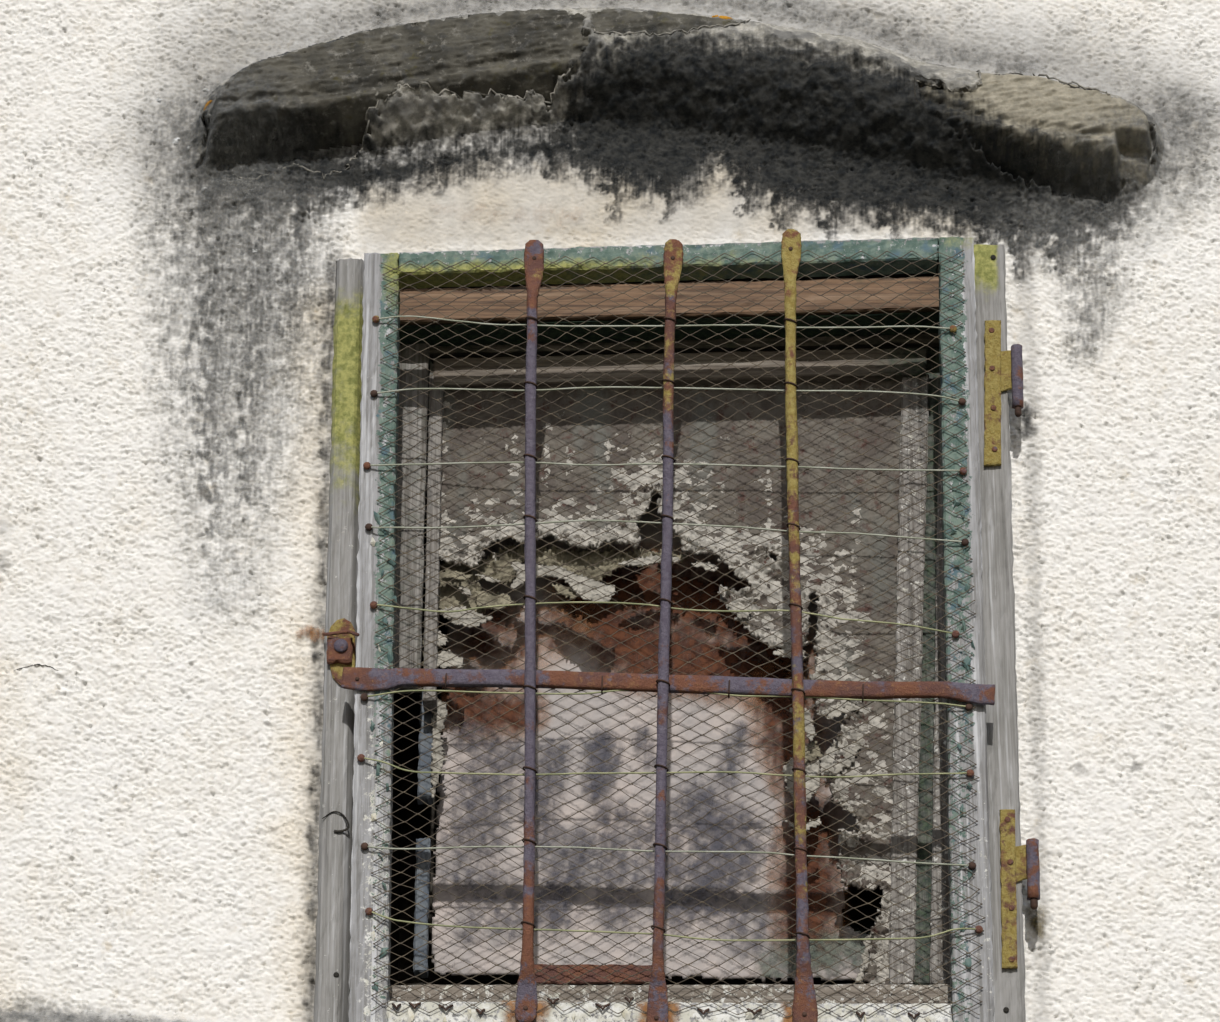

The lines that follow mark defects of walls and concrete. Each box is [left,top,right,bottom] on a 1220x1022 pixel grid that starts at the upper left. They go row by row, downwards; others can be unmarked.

water stain [153,0,1208,500]
peeling [370,511,389,547]
peeling [618,554,718,572]
peeling [430,562,618,669]
peeling [717,592,753,620]
peeling [773,649,807,659]
rust [782,1003,793,1022]